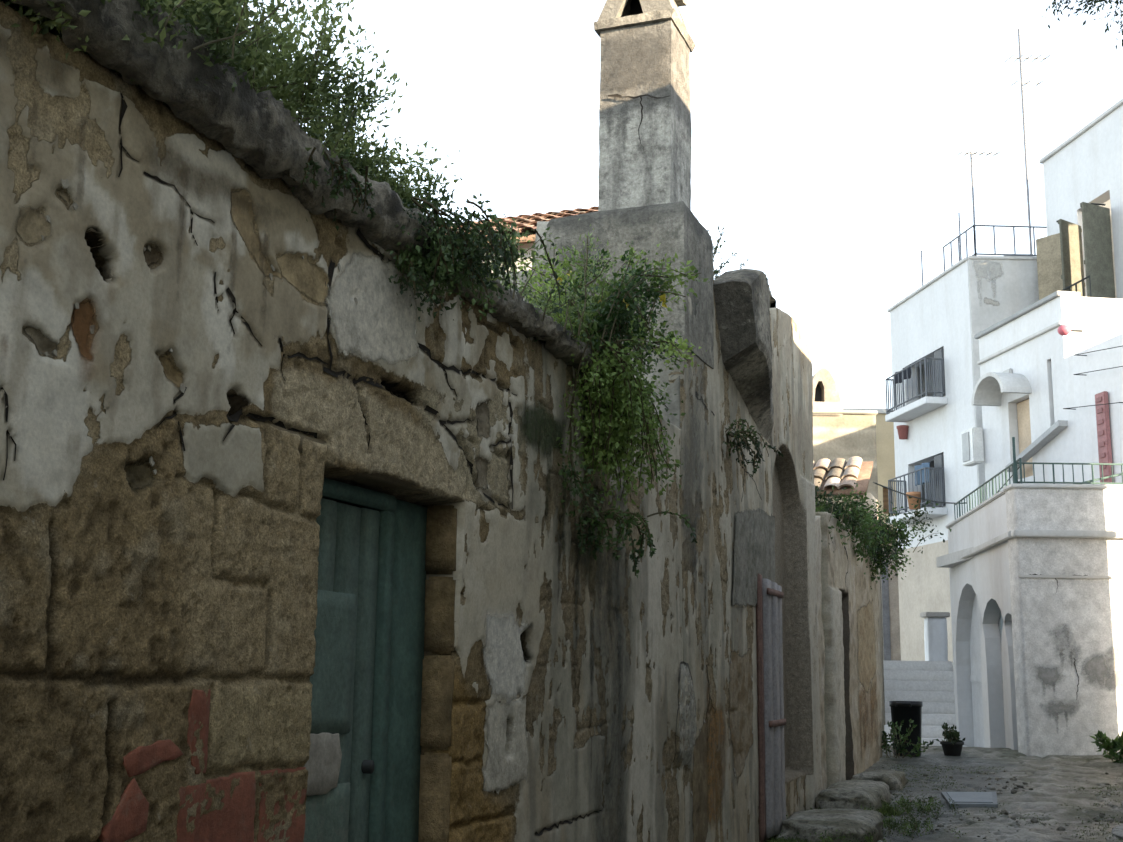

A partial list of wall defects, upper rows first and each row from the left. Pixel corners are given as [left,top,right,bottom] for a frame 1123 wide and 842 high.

crack [608,94,669,151]
crack [118,93,215,246]
hole [84,226,113,281]
flaking render [231,189,329,303]
flaking render [24,326,57,358]
flaking render [72,301,95,361]
crack [158,387,187,451]
hole [227,395,250,416]
crack [214,260,517,509]
water stain [1037,626,1123,689]
water stain [1047,702,1075,732]
crack [535,810,602,836]